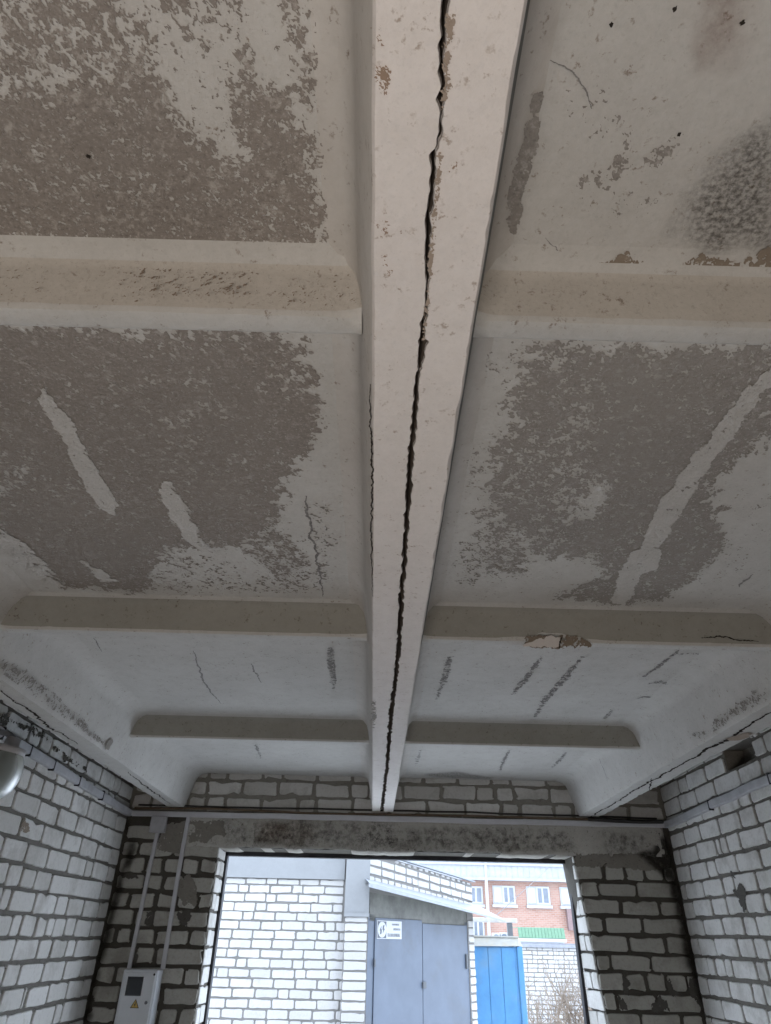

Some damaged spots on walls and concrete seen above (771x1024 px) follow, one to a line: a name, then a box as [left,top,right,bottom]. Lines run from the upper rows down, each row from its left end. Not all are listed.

peeling [0,0,329,243]
peeling [506,91,544,235]
spalling [599,251,643,264]
spalling [685,246,771,267]
mould [697,143,769,244]
peeling [0,325,338,597]
crack [304,496,323,596]
crack [367,384,375,597]
crack [380,0,456,811]
peeling [454,340,771,607]
spalling [523,635,592,649]
crack [590,712,771,817]